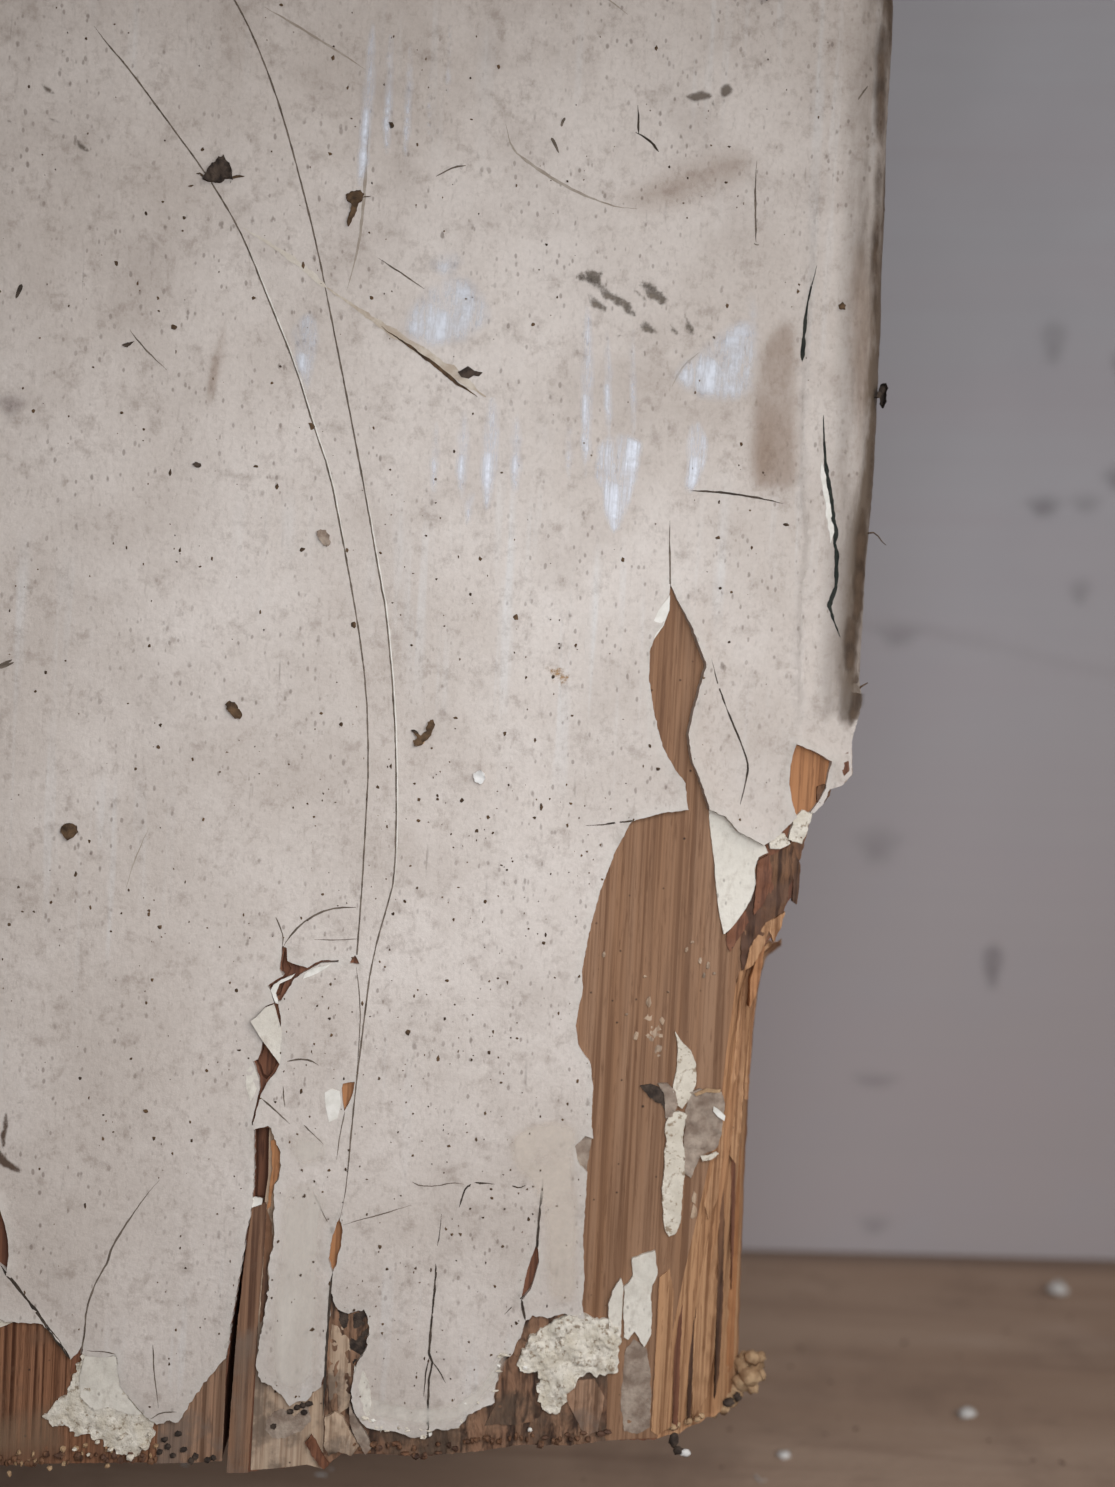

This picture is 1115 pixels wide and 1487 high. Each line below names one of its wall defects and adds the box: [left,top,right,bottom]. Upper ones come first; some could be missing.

crack [821,415,840,636]
crack [94,0,543,1438]
peeling [246,951,331,1101]
peeling [323,587,852,1463]
peeling [0,1212,9,1267]
crack [1,1182,158,1359]
peeling [0,1319,159,1477]